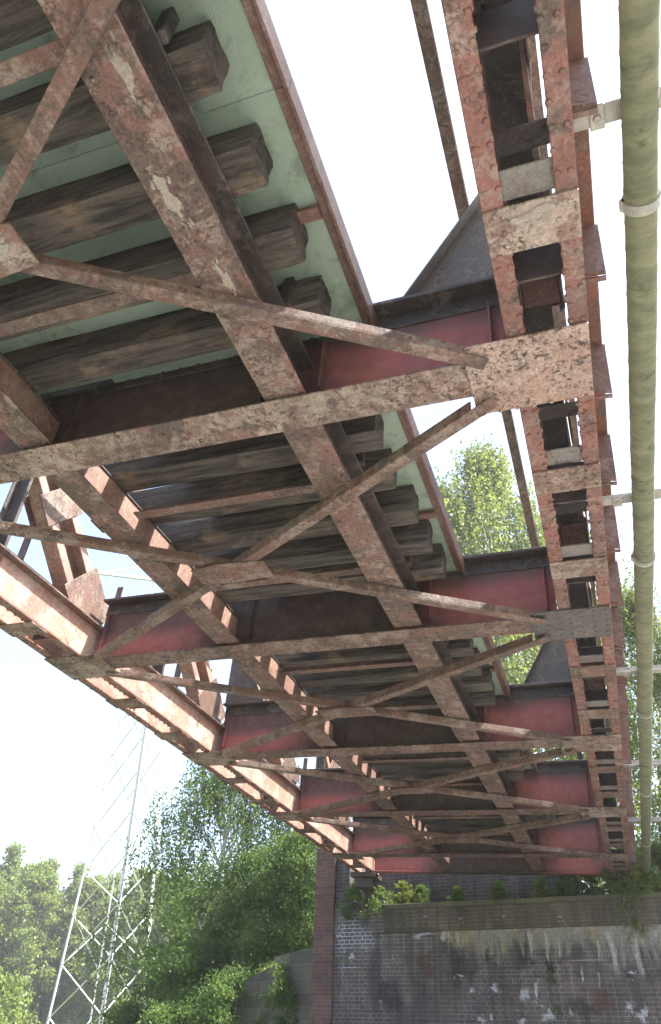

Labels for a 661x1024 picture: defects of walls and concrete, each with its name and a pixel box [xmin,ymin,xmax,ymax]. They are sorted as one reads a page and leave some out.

peeling [103,27,136,100]
peeling [151,175,195,229]
water stain [416,924,661,981]
water stain [515,978,573,1024]